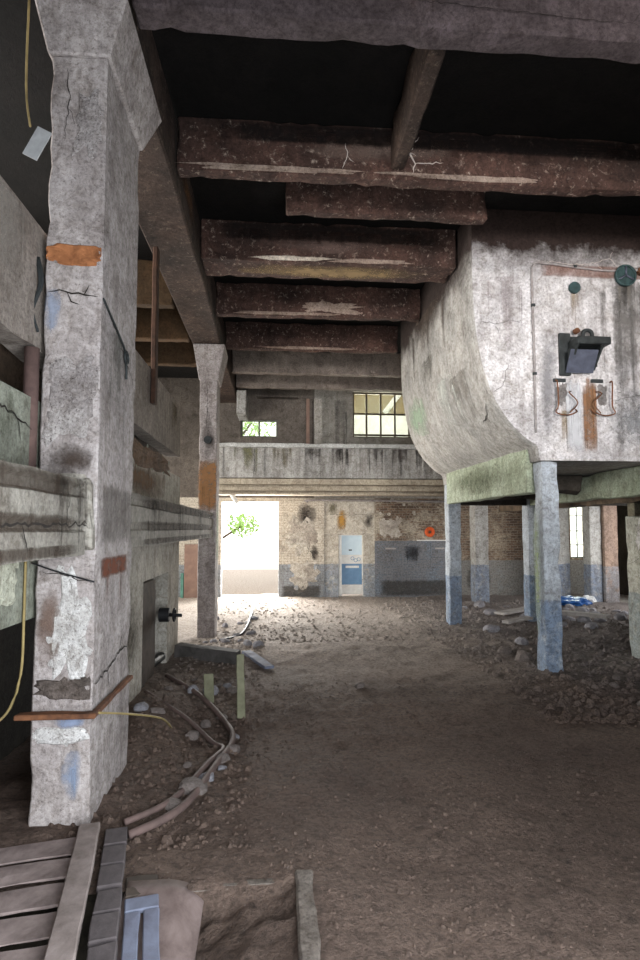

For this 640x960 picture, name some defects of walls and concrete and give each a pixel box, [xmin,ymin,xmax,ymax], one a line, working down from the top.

crack [48,286,133,380]
rust [583,379,597,444]
flaking render [376,498,417,538]
peeling [0,563,19,606]
flaking render [282,514,323,590]